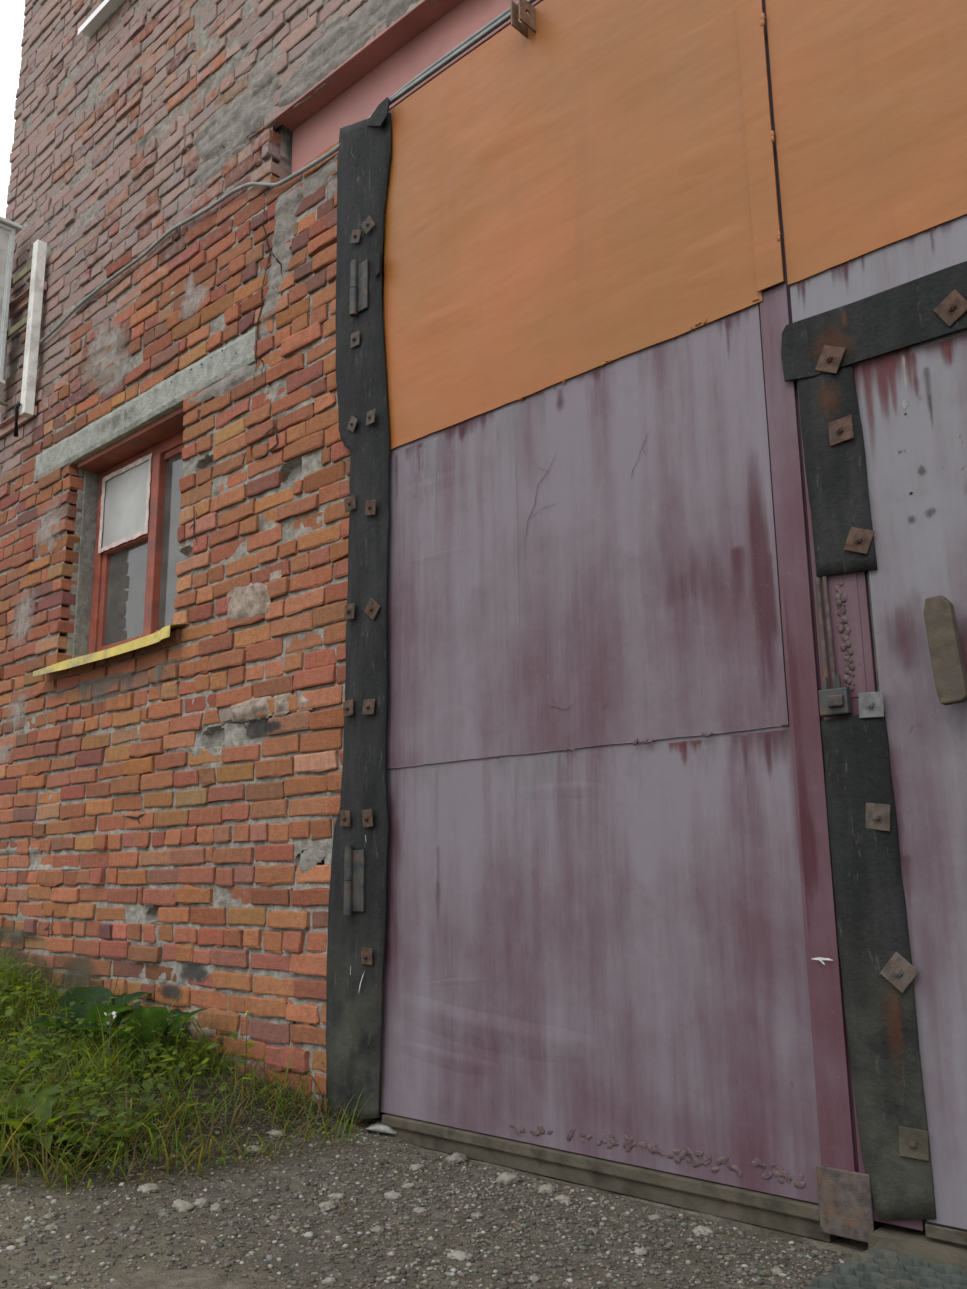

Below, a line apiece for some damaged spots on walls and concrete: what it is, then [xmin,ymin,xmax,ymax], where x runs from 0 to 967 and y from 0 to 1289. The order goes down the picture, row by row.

spalling [227,570,282,621]